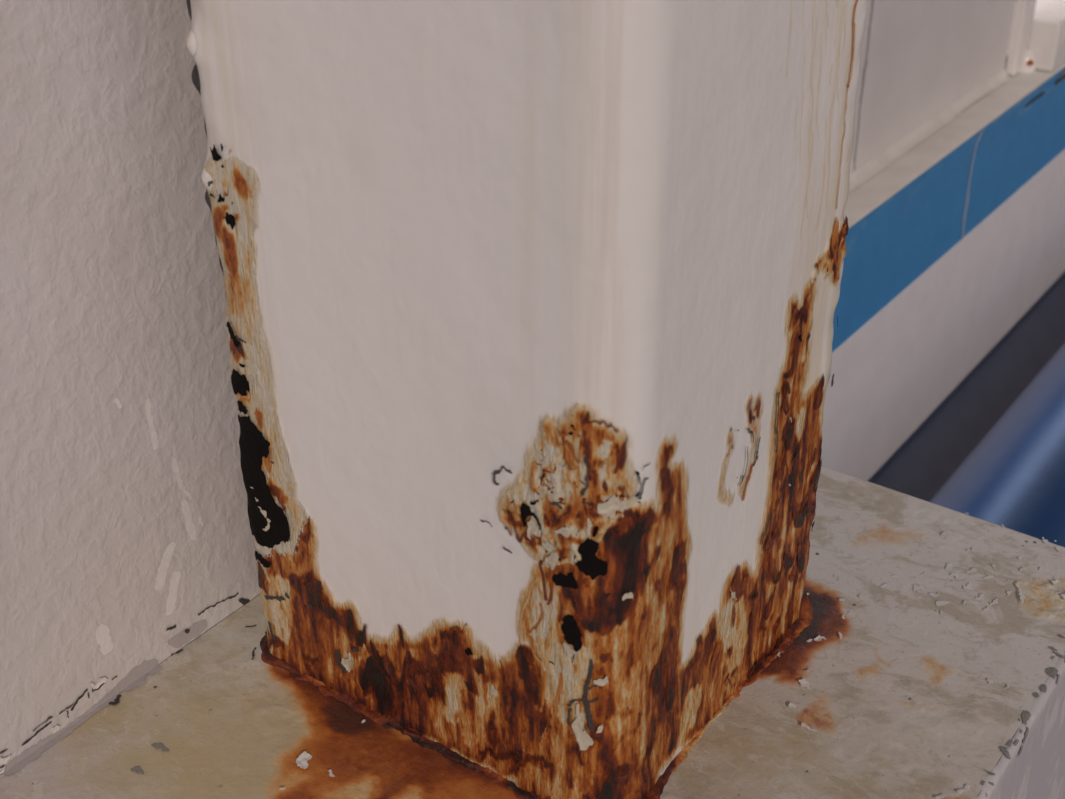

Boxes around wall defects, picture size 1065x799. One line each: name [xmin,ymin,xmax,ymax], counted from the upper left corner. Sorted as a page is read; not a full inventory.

rust [836,0,858,208]
crack [854,0,874,170]
rust [203,144,911,799]
peeling [913,537,1065,698]
peeling [3,658,162,776]
spalling [1000,711,1031,759]